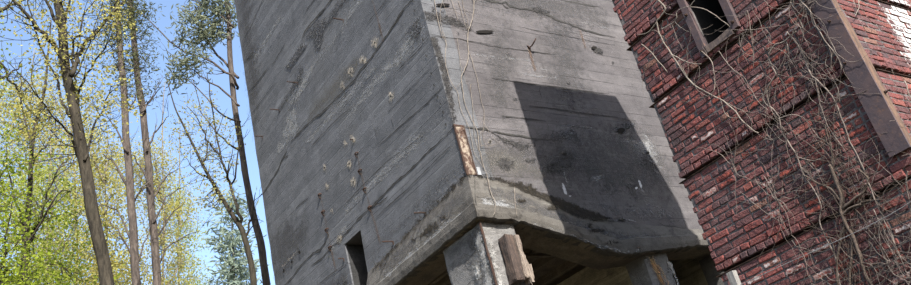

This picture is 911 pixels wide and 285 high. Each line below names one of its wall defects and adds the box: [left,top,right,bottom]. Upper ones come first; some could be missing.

efflorescence [878,0,911,60]
spalling [471,232,504,285]